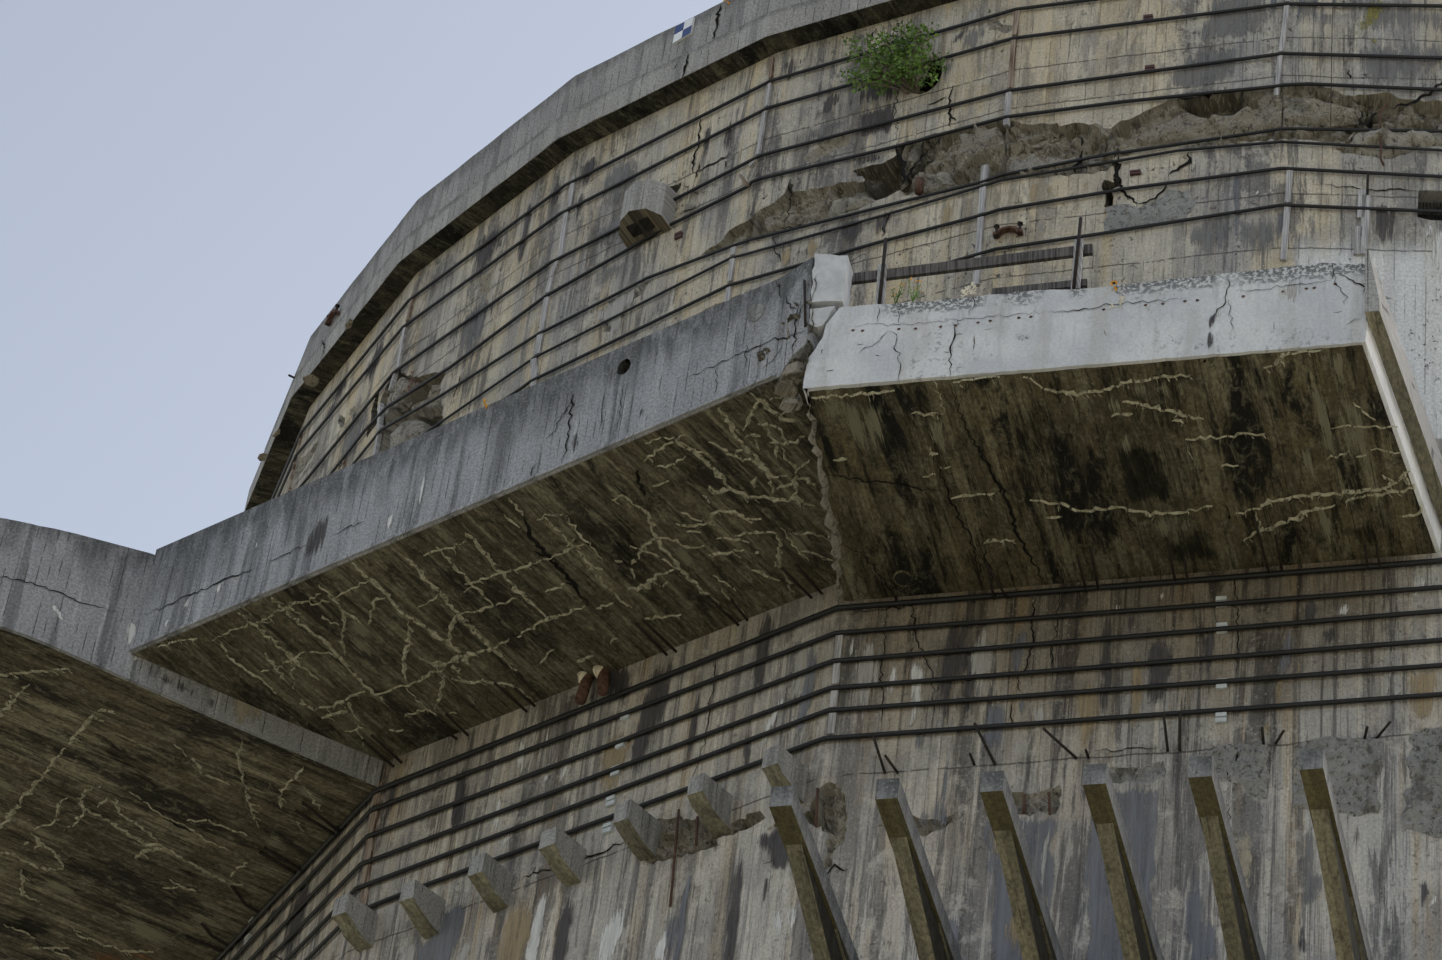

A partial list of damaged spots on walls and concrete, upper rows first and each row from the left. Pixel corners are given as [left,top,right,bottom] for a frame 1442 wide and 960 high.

water stain [1171,0,1276,88]
water stain [1297,0,1441,82]
crack [678,118,726,214]
spalling [702,86,1442,256]
crack [1072,137,1192,204]
water stain [1302,352,1375,483]
crack [0,179,1423,777]
crack [0,708,322,960]
spalling [643,811,775,865]
water stain [757,829,789,900]
spalling [805,782,848,869]
spalling [1010,784,1062,817]